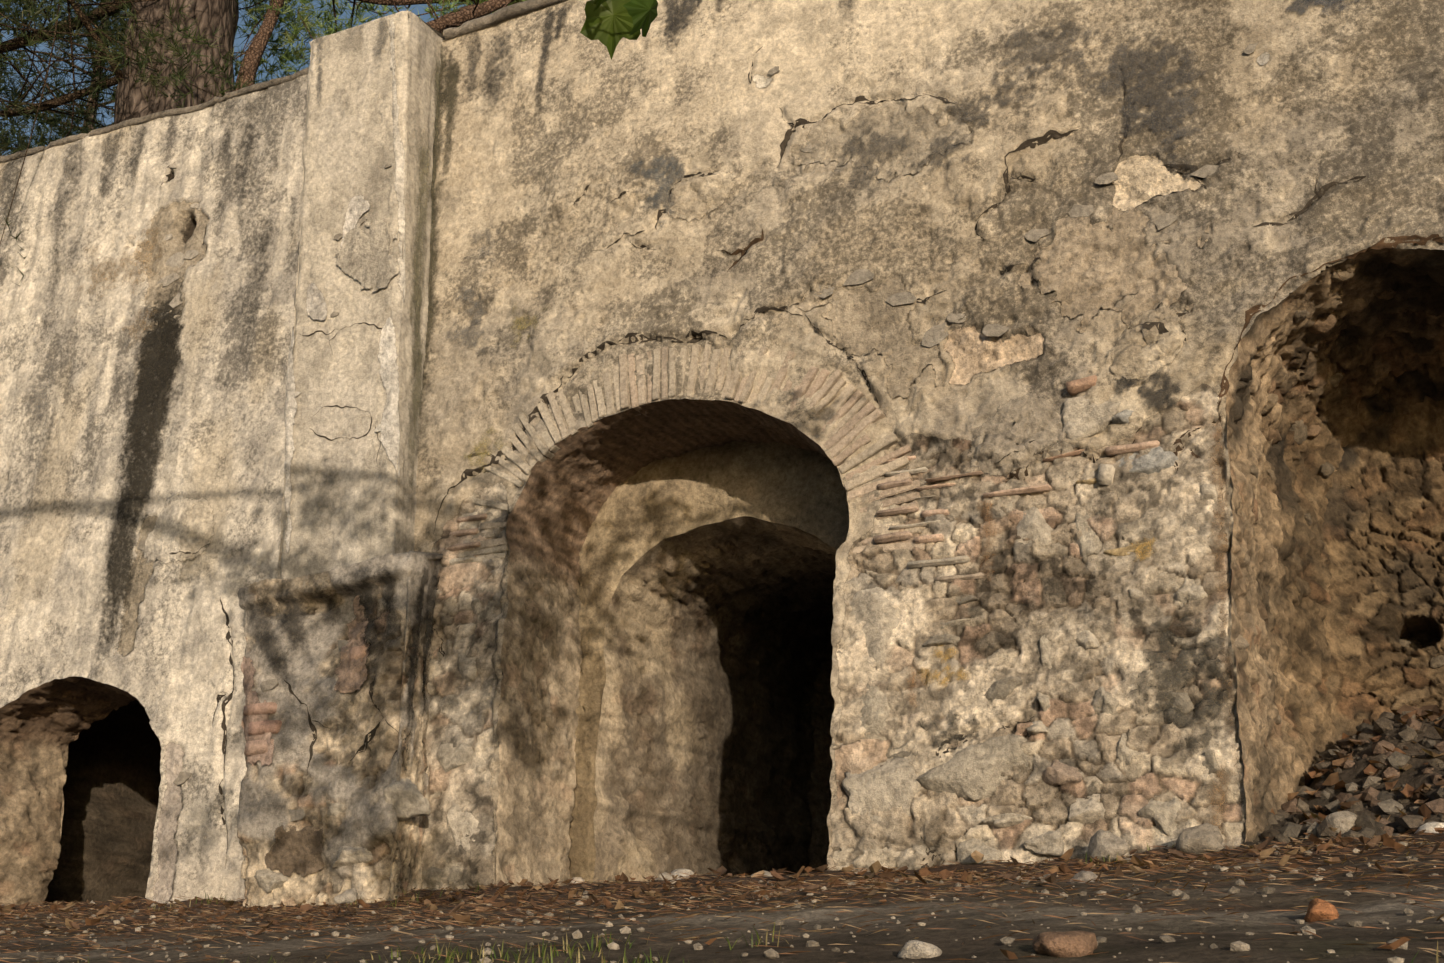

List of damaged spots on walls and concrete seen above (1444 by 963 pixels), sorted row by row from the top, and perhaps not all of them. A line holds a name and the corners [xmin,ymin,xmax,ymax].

leakage [536,7,569,105]
leakage [665,0,701,45]
crack [777,93,955,168]
leakage [839,22,1204,190]
crack [975,129,1079,241]
flaking render [1017,155,1219,334]
crack [1163,151,1245,189]
crack [1253,175,1366,227]
flaking render [922,313,1044,385]
leakage [98,286,183,658]
flaking render [831,375,1243,872]
flaking render [254,801,373,893]